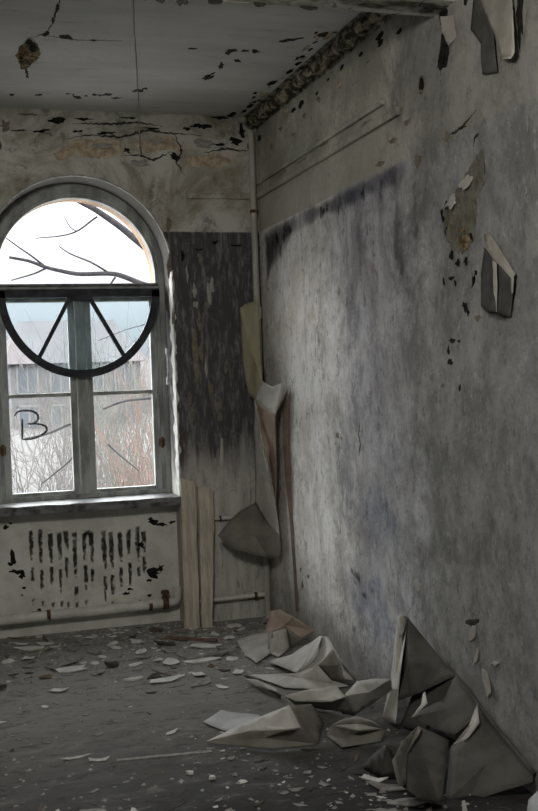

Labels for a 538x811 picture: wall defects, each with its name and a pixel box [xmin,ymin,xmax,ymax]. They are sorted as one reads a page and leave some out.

flaking render [15,0,76,79]
flaking render [0,12,391,176]
spalling [417,75,426,94]
flaking render [440,149,486,266]
peeling [218,300,288,558]
flaking render [8,549,26,596]
flaking render [146,565,164,582]
peeling [465,619,499,697]